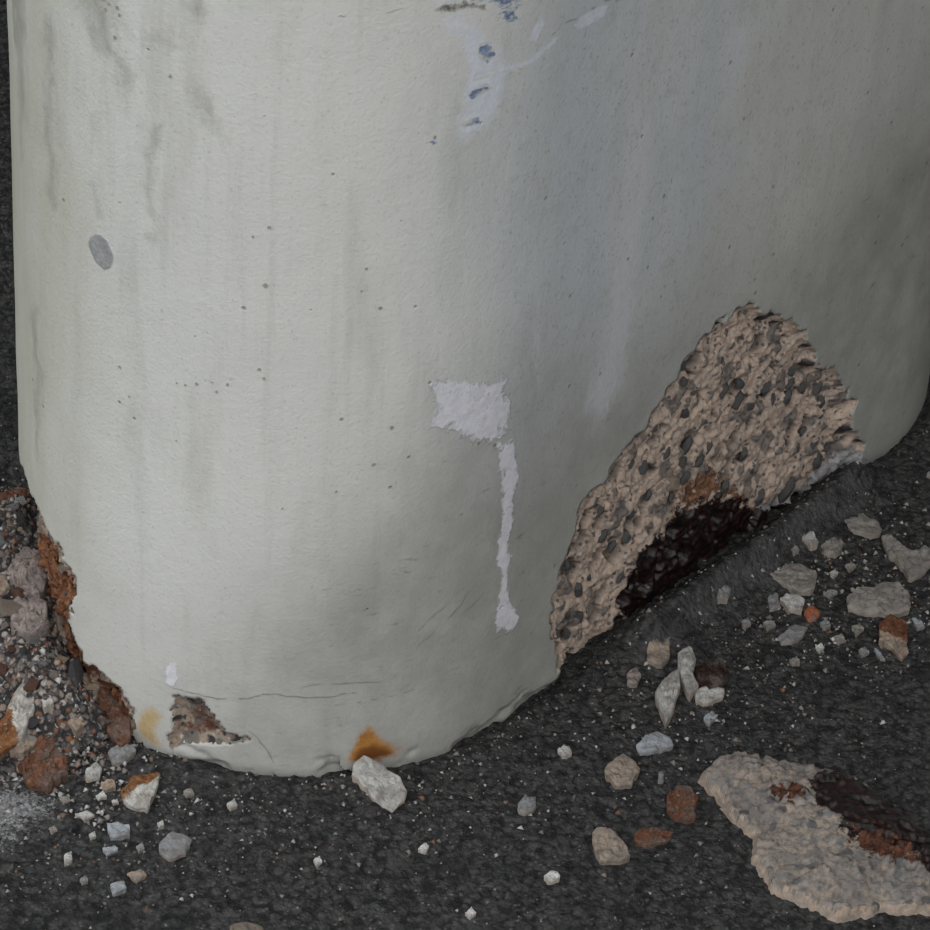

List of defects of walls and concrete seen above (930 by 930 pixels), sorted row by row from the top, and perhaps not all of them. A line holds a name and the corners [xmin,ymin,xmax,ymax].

corrosion [36,533,85,668]
spalling [36,507,161,813]
spalling [164,661,251,749]
crack [173,681,415,705]
corrosion [340,720,409,771]
spalling [550,304,870,688]
corrosion [615,467,805,617]
peeling [763,531,930,662]
peeling [75,810,95,823]
peeling [103,822,145,857]